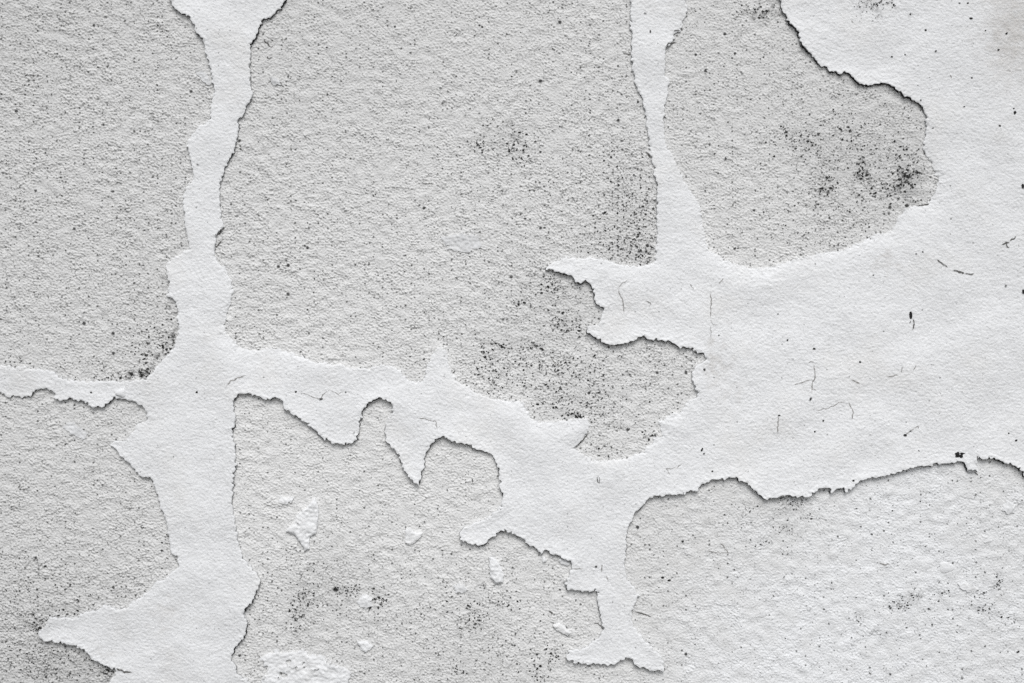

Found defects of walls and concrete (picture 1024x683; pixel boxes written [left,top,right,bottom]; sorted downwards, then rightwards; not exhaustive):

peeling [0,0,215,383]
peeling [215,0,706,462]
peeling [663,0,938,269]
peeling [0,388,179,683]
peeling [231,393,1024,683]